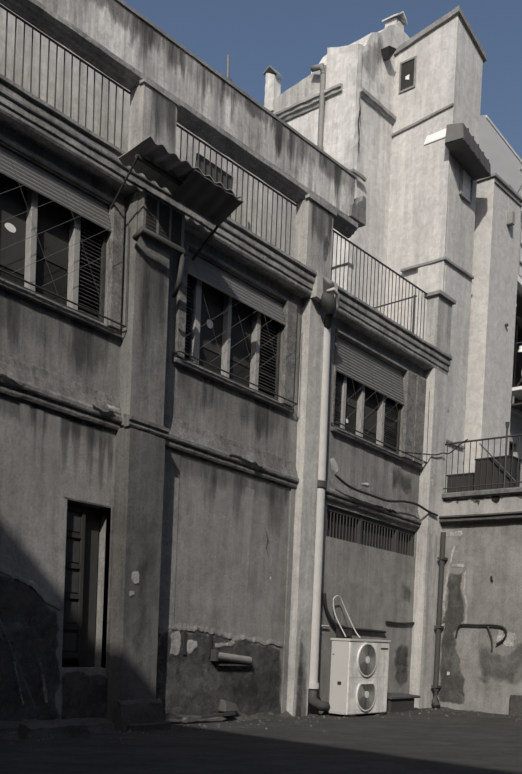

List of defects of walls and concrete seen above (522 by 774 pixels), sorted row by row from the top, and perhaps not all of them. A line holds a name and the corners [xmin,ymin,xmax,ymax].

water stain [108,0,123,23]
water stain [250,100,262,118]
water stain [275,119,292,151]
spalling [0,564,108,721]
spalling [156,623,283,720]